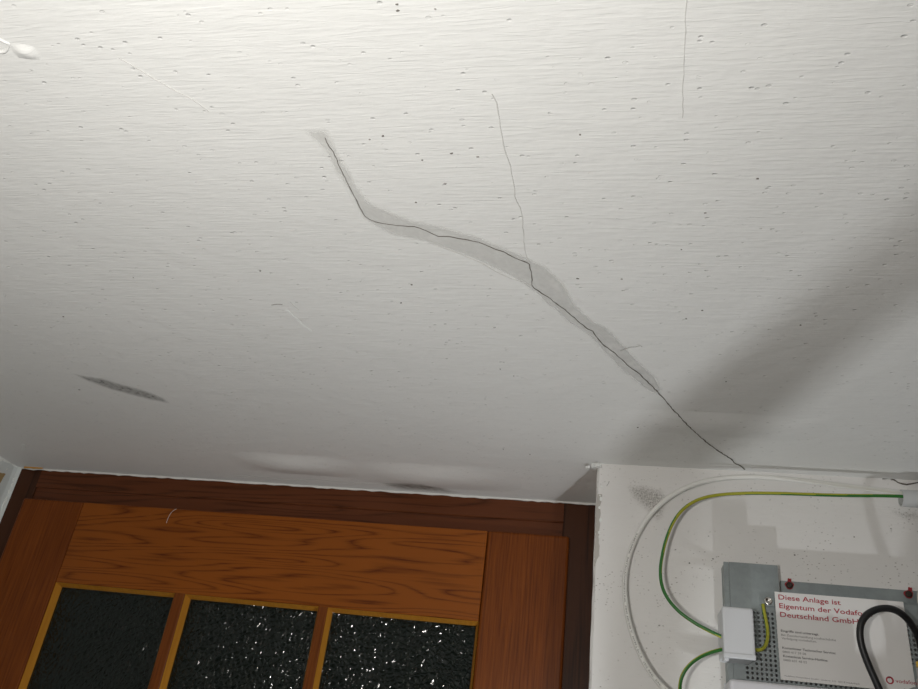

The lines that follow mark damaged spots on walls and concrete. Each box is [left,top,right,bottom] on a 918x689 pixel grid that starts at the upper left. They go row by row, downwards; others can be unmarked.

crack [325,94,745,470]